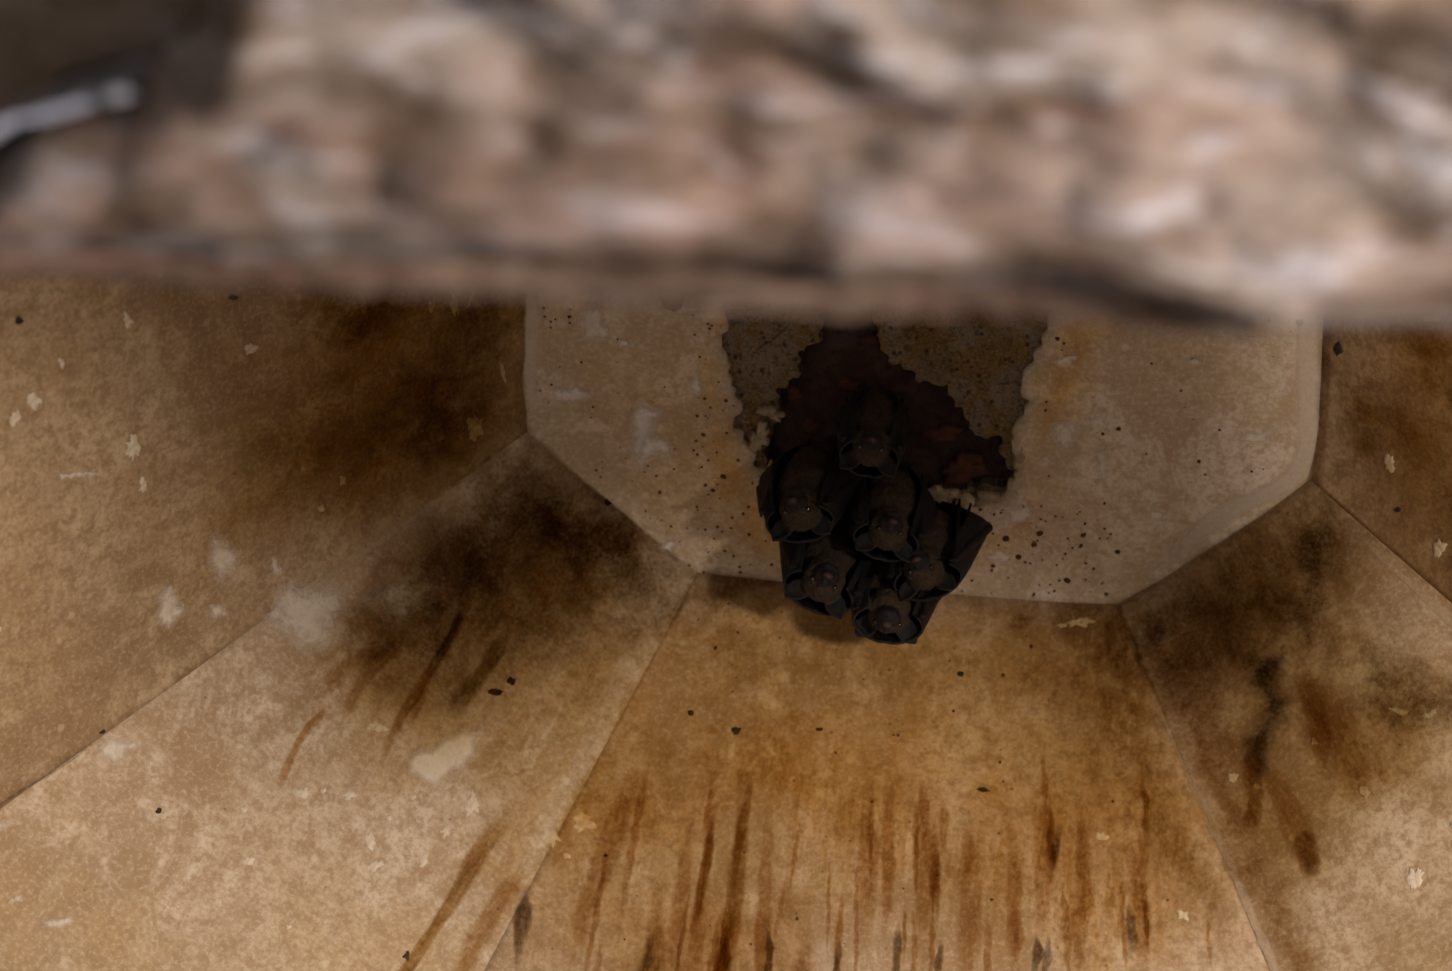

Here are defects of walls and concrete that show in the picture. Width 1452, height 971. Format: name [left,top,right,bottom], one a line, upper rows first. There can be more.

flaking render [722,309,1048,523]
leakage [367,467,635,675]
leakage [488,677,516,696]
leakage [1247,660,1283,786]